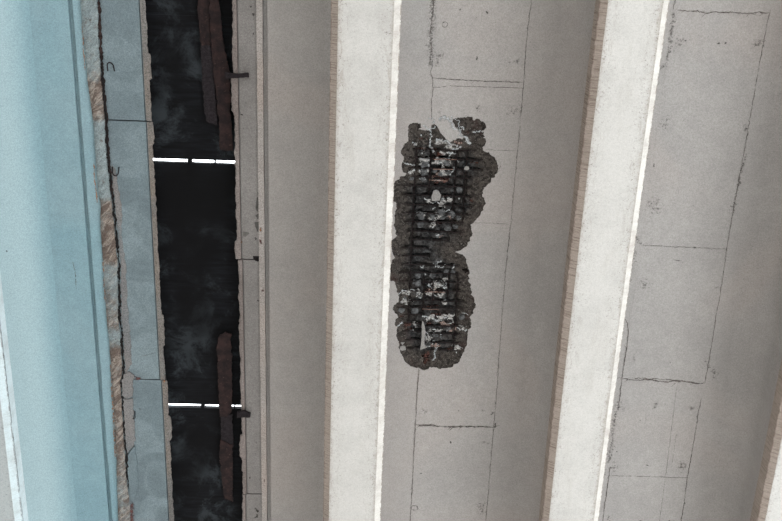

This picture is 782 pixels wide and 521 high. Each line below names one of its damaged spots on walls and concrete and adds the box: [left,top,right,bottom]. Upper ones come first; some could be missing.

crack [97,0,153,489]
spalling [390,115,498,370]
crack [410,0,531,520]
crack [617,1,770,521]